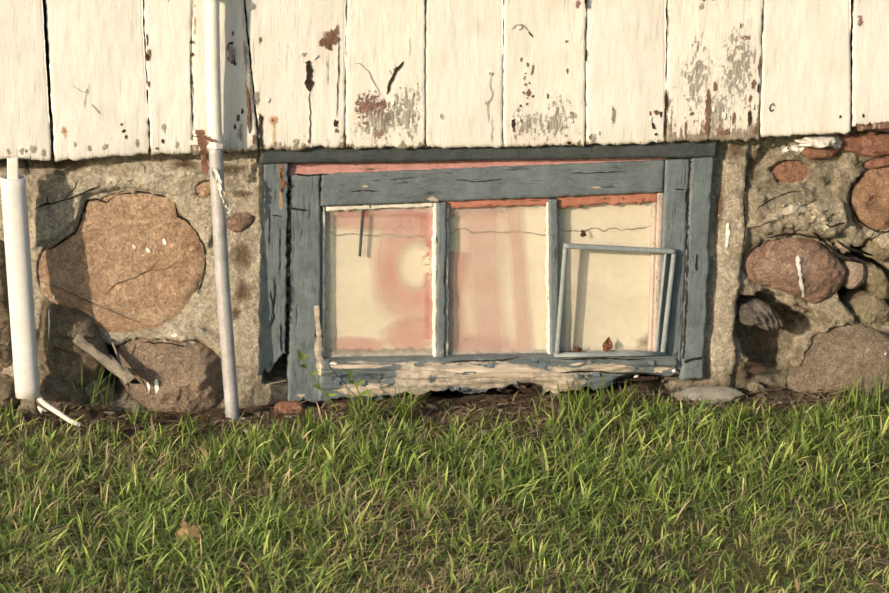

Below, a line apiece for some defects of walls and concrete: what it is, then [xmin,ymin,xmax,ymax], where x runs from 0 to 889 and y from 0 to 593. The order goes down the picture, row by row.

peeling [318,24,340,133]
peeling [353,81,422,147]
peeling [511,58,577,144]
peeling [680,21,761,141]
peeling [428,356,680,394]